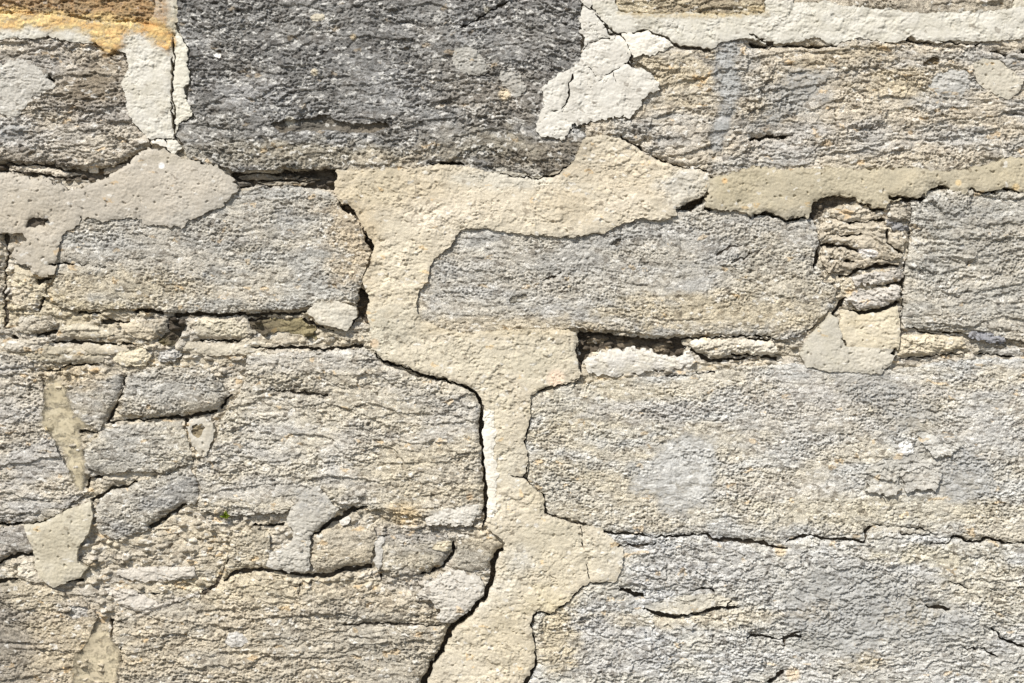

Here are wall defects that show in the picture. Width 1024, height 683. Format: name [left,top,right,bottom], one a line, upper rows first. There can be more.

flaking render [536,0,1024,141]
crack [202,559,372,595]
crack [342,547,504,683]
crack [375,353,488,526]
crack [511,336,1024,683]